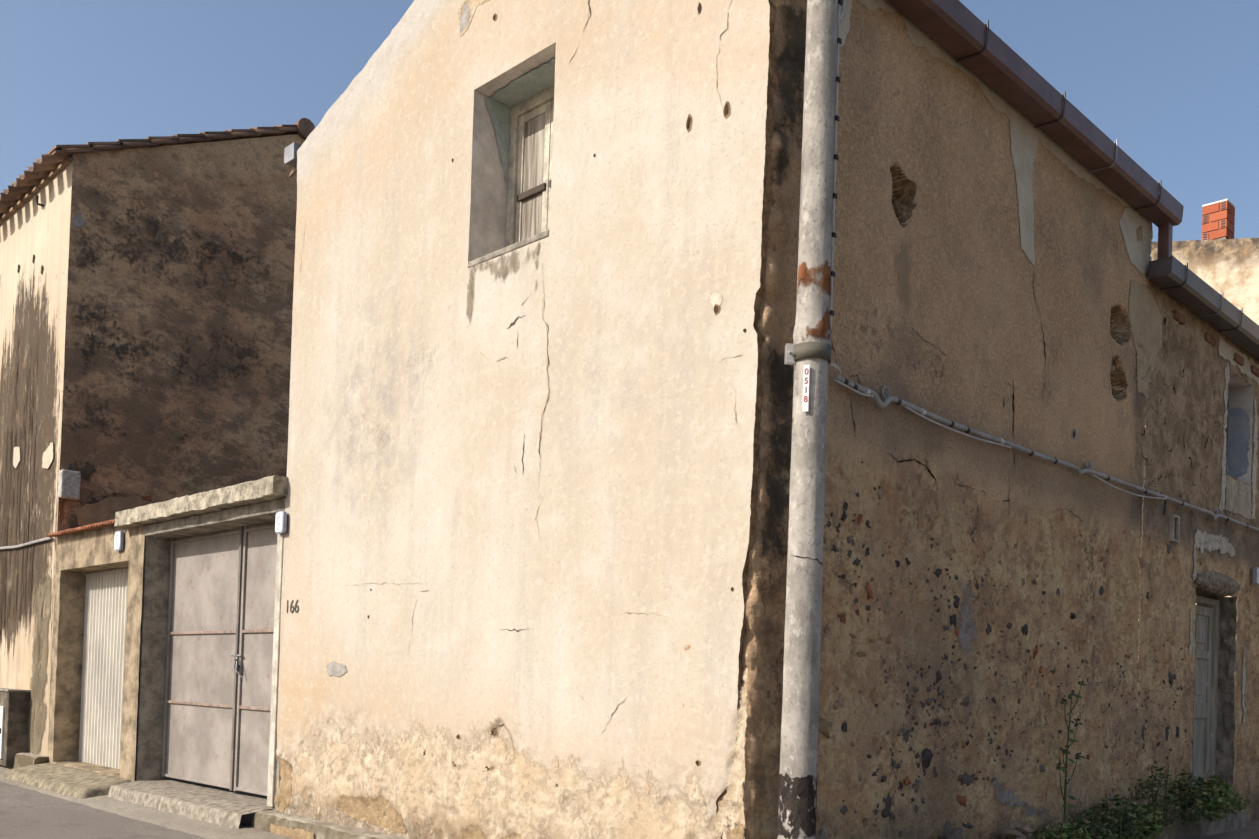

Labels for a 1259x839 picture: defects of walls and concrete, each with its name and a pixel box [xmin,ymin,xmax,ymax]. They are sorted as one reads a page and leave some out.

spalling [458,0,497,37]
crack [716,0,732,109]
damp [771,4,807,186]
damp [75,298,259,388]
damp [74,198,269,306]
rust [797,260,831,295]
rust [802,310,832,341]
peeling [839,0,1167,401]
crack [481,264,550,540]
damp [0,338,51,754]
peeling [1193,529,1236,581]
spalling [270,654,748,839]